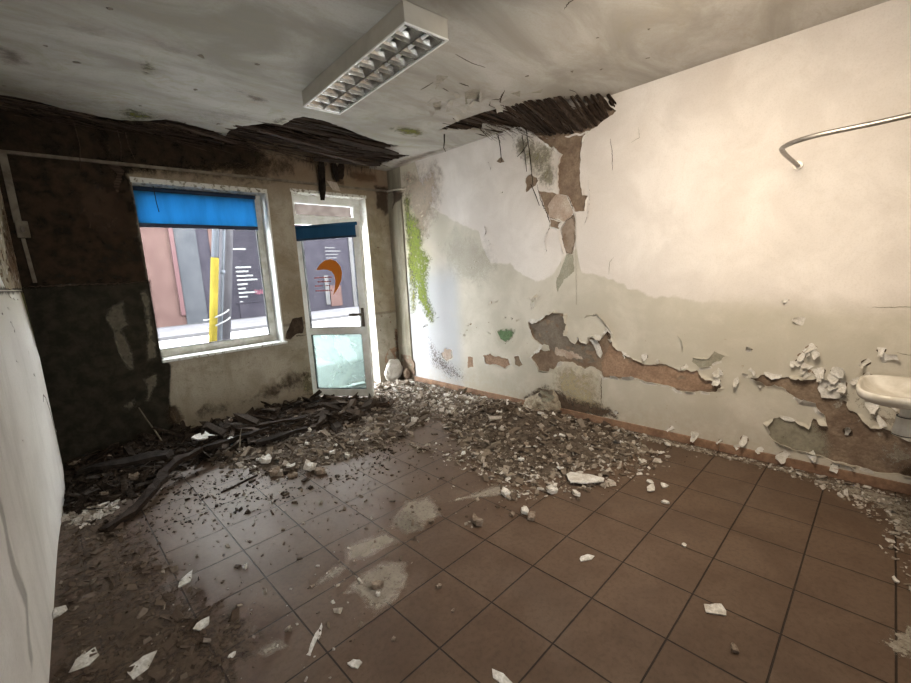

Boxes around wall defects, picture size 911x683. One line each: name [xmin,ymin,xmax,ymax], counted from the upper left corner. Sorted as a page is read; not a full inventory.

peeling [465,89,520,113]
flaking render [524,131,590,230]
damp [0,108,299,465]
damp [264,373,311,398]
flaking render [468,293,911,480]